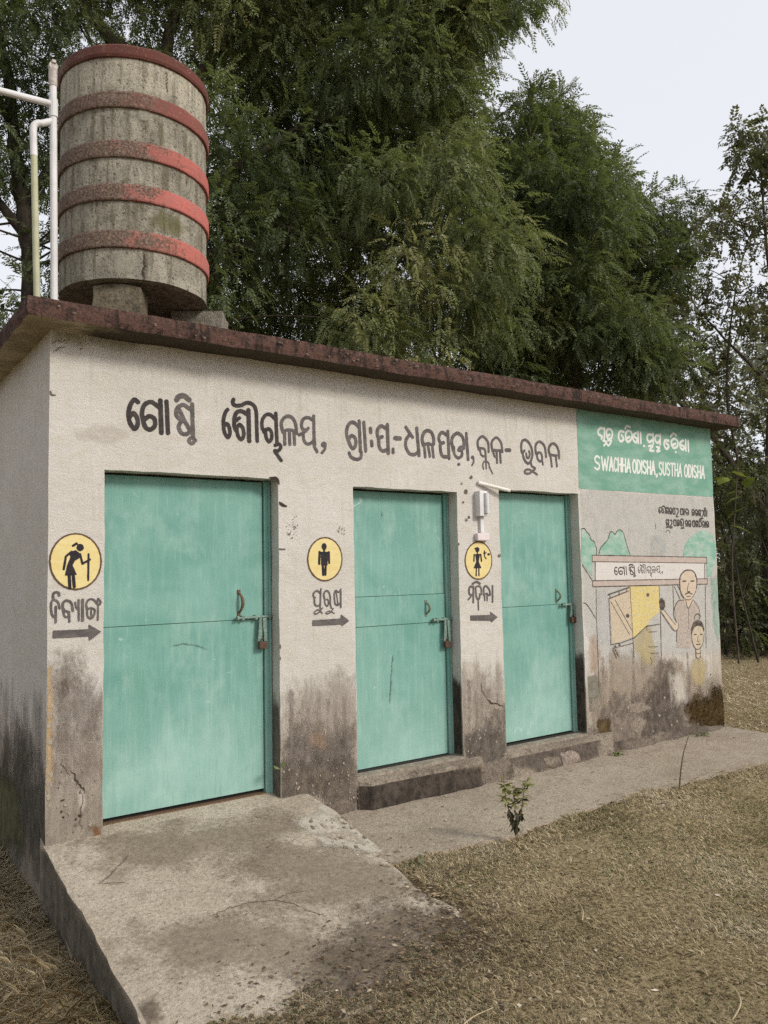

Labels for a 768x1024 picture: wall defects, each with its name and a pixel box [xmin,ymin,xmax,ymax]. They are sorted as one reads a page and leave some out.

crack [60,759,85,827]
water stain [51,659,103,773]
water stain [272,653,722,810]
water stain [0,732,133,1024]